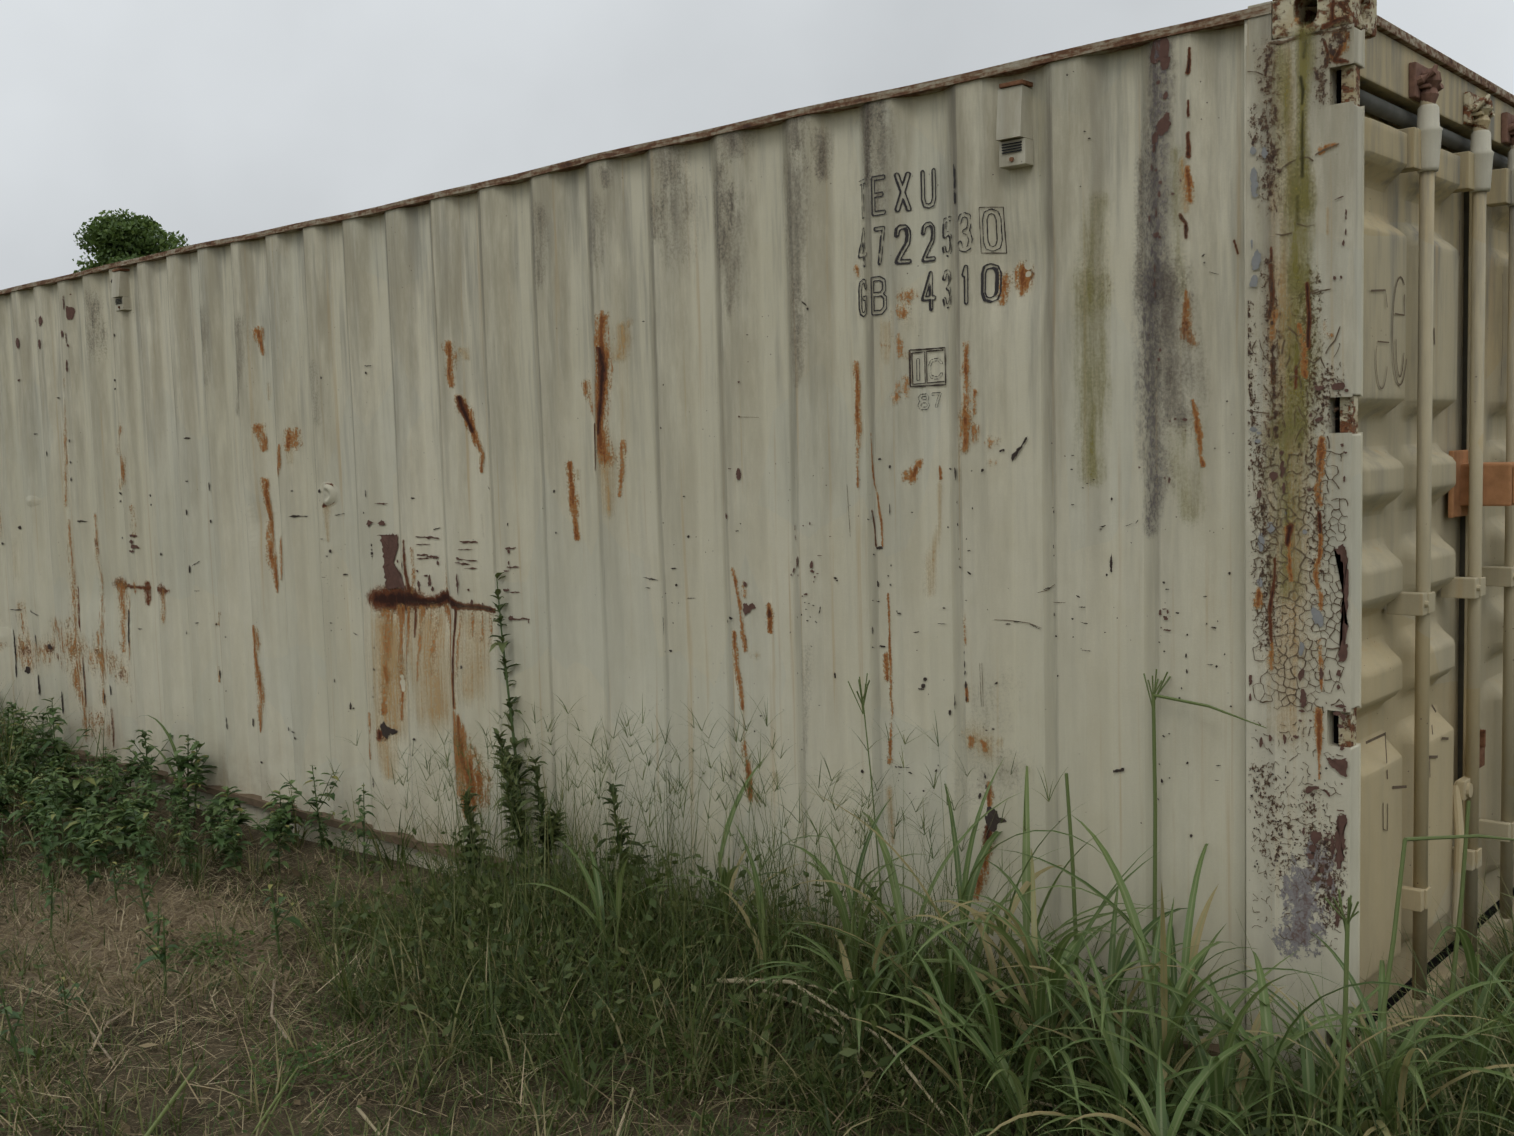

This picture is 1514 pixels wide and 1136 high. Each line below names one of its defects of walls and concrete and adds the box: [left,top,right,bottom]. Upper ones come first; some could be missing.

leakage [1137,37,1185,532]
corrosion [1179,100,1194,239]
leakage [1289,76,1309,289]
corrosion [5,401,170,746]
corrosion [253,423,303,593]
corrosion [367,540,496,820]
corrosion [441,341,485,473]
corrosion [566,461,580,541]
corrosion [581,311,627,510]
corrosion [960,341,998,462]
crack [1247,274,1348,950]
peeling [1248,240,1349,961]